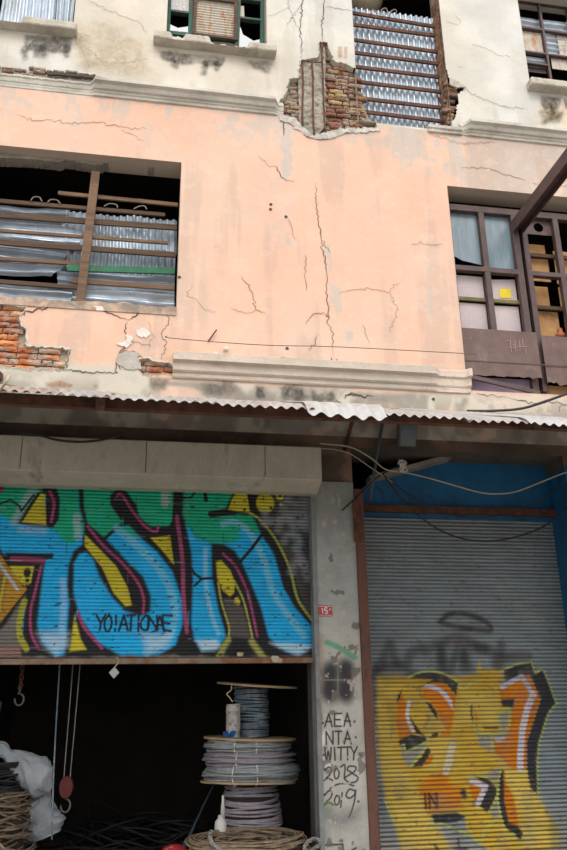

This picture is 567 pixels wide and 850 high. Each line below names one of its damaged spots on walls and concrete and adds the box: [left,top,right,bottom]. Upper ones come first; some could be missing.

crack [271,0,351,52]
spalling [0,66,96,80]
spalling [278,42,380,139]
crack [304,186,397,351]
spalling [0,304,72,372]
spalling [116,327,173,377]
damp [284,386,335,402]